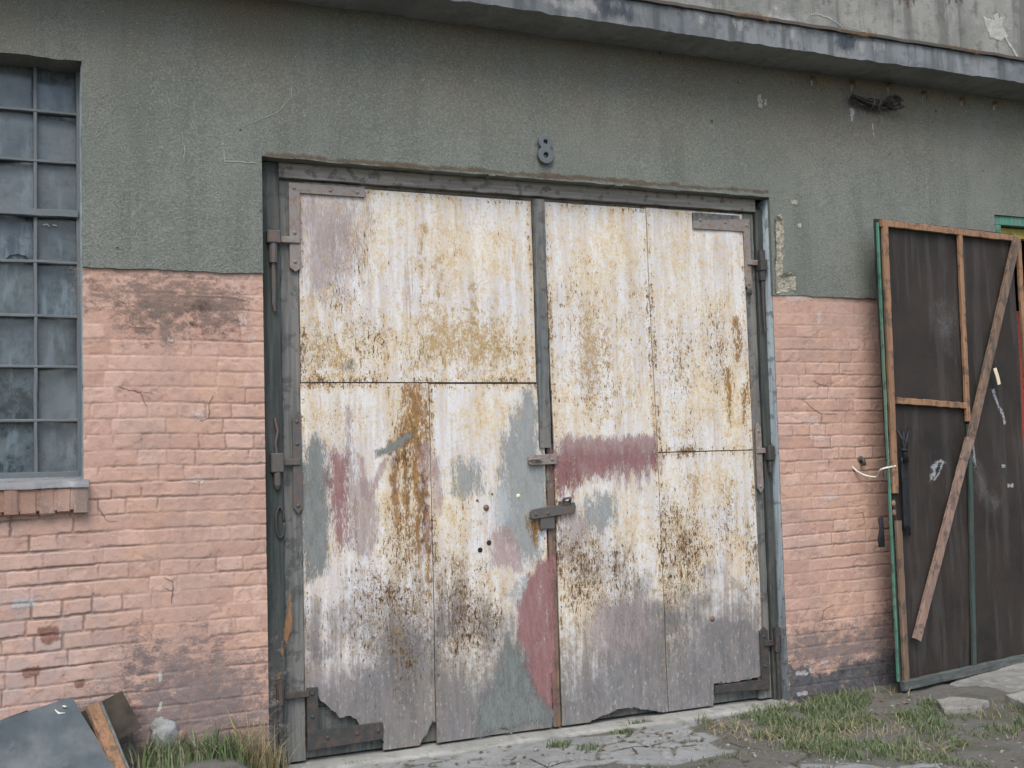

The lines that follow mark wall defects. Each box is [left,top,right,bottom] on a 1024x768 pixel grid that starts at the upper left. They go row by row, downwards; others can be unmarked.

water stain [141,300,228,341]
rust [301,304,396,381]
rust [570,301,613,399]
rust [722,316,755,443]
flaking render [775,214,823,325]
rust [331,224,532,716]
rust [525,516,623,617]
rust [645,474,711,615]
water stain [118,619,283,763]
water stain [783,600,897,703]